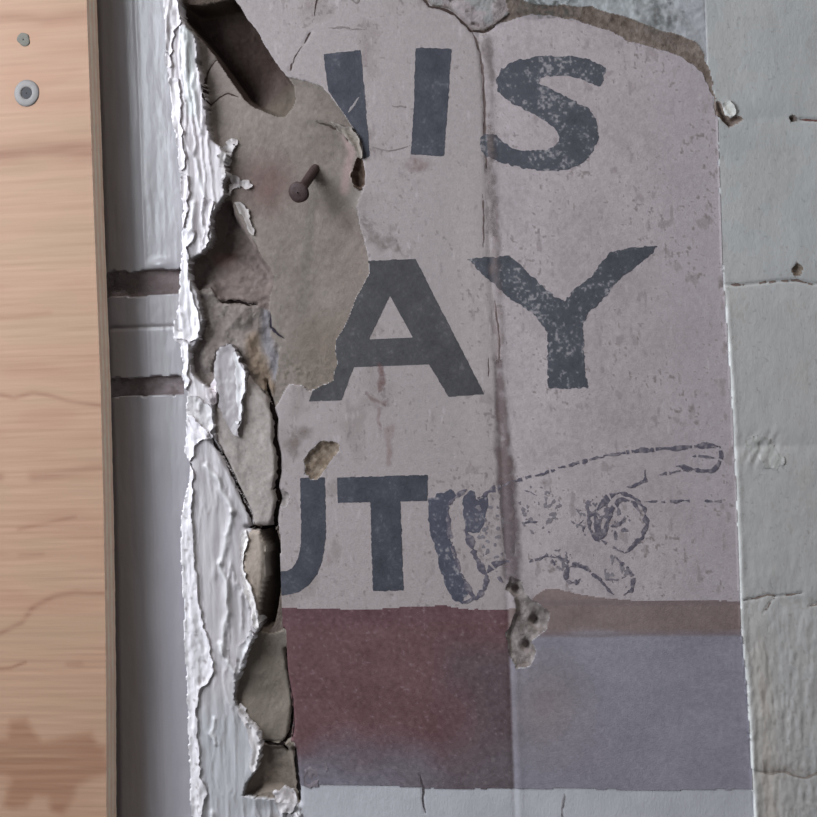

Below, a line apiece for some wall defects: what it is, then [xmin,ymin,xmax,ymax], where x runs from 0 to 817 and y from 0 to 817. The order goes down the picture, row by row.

spalling [482,0,743,127]
crack [731,278,812,286]
spalling [163,0,370,817]
damp [495,360,520,581]
crack [745,593,817,610]
crack [757,771,817,779]